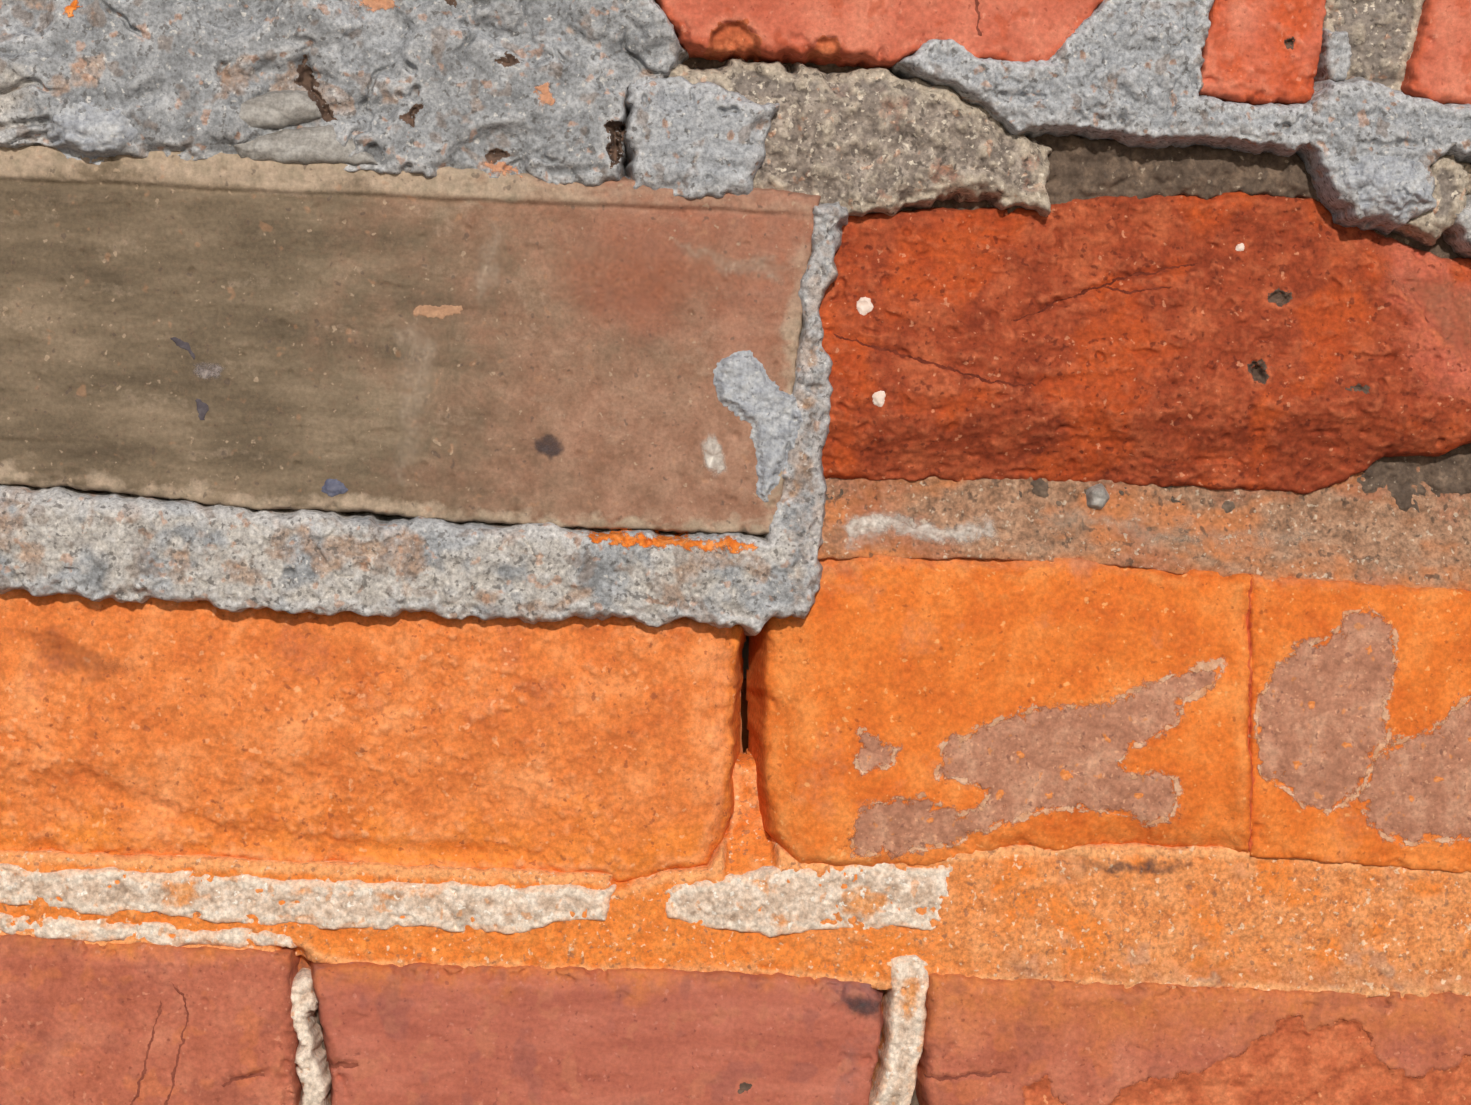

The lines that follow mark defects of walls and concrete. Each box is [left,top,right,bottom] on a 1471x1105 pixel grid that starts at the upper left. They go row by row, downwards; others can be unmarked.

crack [974,0,982,36]
peeling [848,657,1227,859]
peeling [1248,609,1471,847]
crack [130,981,189,1105]
spalling [1022,1075,1066,1105]
spalling [1109,1015,1471,1105]